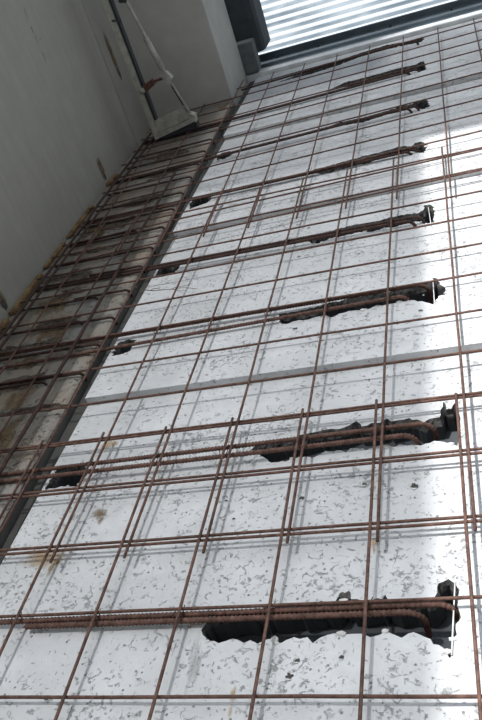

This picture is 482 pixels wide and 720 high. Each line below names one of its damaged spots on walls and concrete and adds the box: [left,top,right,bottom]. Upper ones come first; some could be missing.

spalling [280,38,424,82]
spalling [330,61,426,91]
spalling [331,100,430,126]
spalling [314,142,428,174]
spalling [309,204,435,245]
spalling [279,278,447,330]
spalling [111,339,137,356]
spalling [251,402,463,463]
spalling [45,467,87,490]
spalling [201,579,461,658]